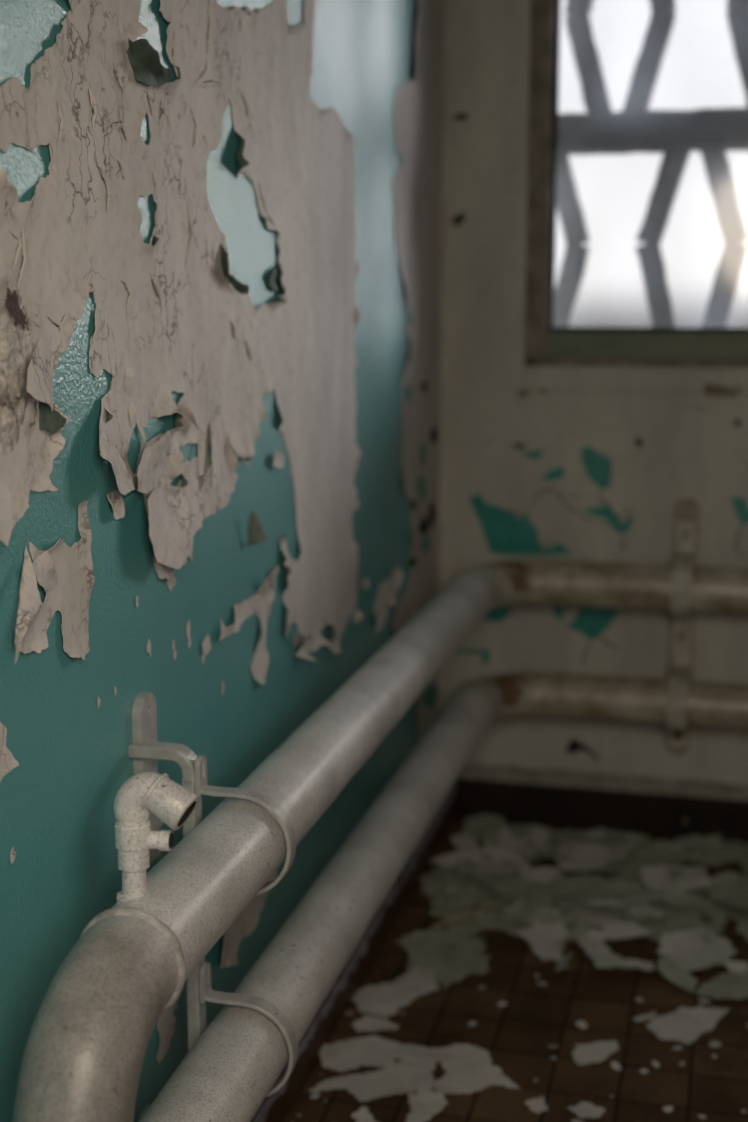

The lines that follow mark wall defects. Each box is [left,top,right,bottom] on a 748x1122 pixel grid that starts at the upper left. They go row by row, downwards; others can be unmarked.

water stain [6,288,30,336]
peeling [0,0,370,664]
peeling [469,493,573,556]
peeling [581,445,637,533]
peeling [731,497,748,526]
peeling [553,606,628,640]
peeling [0,722,19,782]